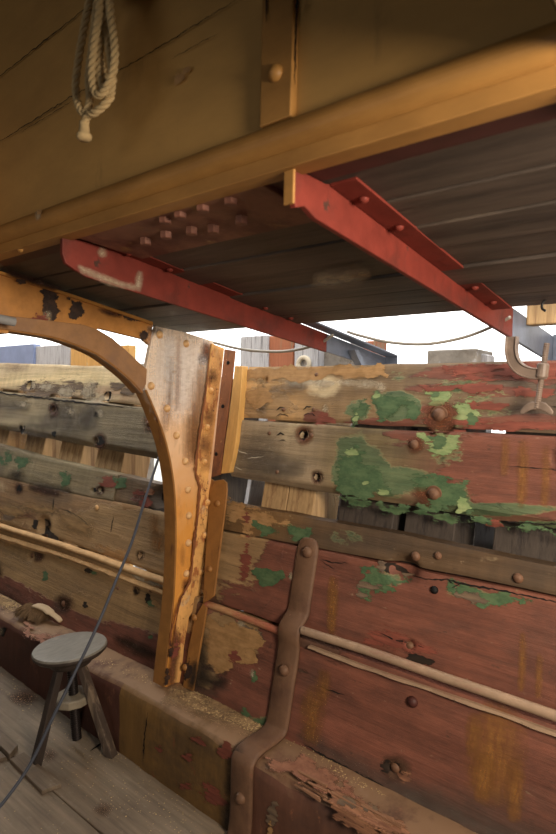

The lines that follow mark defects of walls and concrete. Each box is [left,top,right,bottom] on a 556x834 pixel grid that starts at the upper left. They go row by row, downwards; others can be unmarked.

crack [0,10,83,76]
crack [118,1,233,71]
crack [292,0,300,85]
crack [0,82,97,141]
peeling [245,363,389,409]
peeling [351,363,556,457]
peeling [334,445,556,536]
peeling [356,565,413,602]
peeling [446,578,533,609]
peeling [203,608,266,683]
peeling [265,754,362,800]